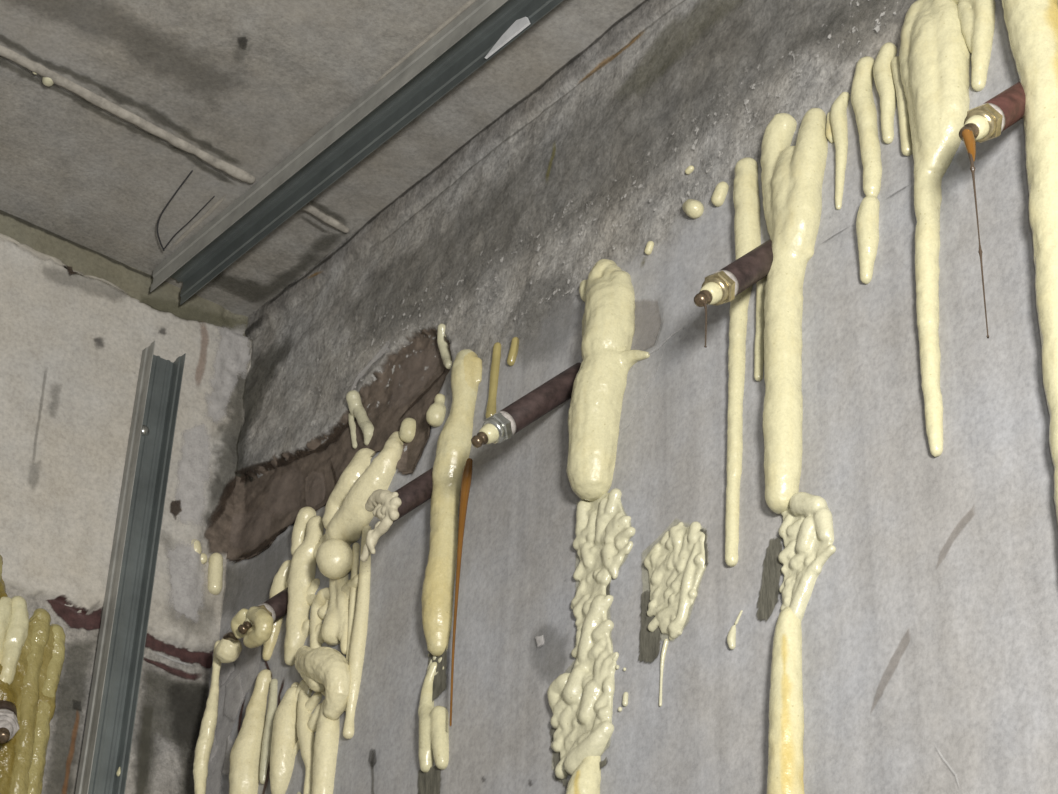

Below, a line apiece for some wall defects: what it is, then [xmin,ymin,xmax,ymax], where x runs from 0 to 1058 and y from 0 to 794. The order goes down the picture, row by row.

damp [270,0,647,304]
spalling [205,328,452,562]
damp [307,278,465,396]